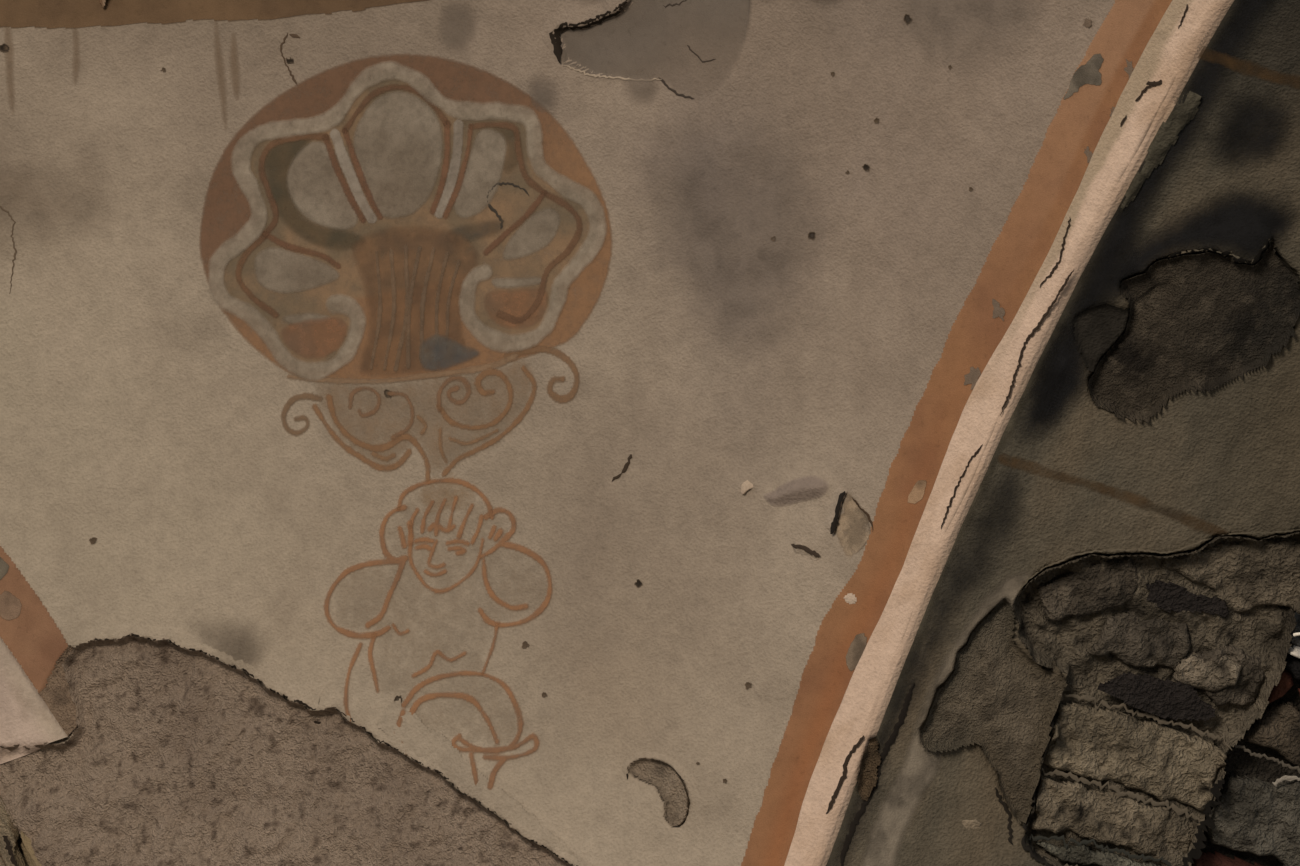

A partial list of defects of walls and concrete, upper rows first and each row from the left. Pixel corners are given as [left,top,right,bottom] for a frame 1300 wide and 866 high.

peeling [541,0,750,99]
crack [0,206,17,294]
crack [1000,217,1074,416]
peeling [824,488,873,556]
crack [941,444,983,529]
peeling [846,633,867,671]
spalling [920,528,1300,866]
spalling [0,622,611,866]
spalling [622,751,699,826]
spalling [857,737,881,801]